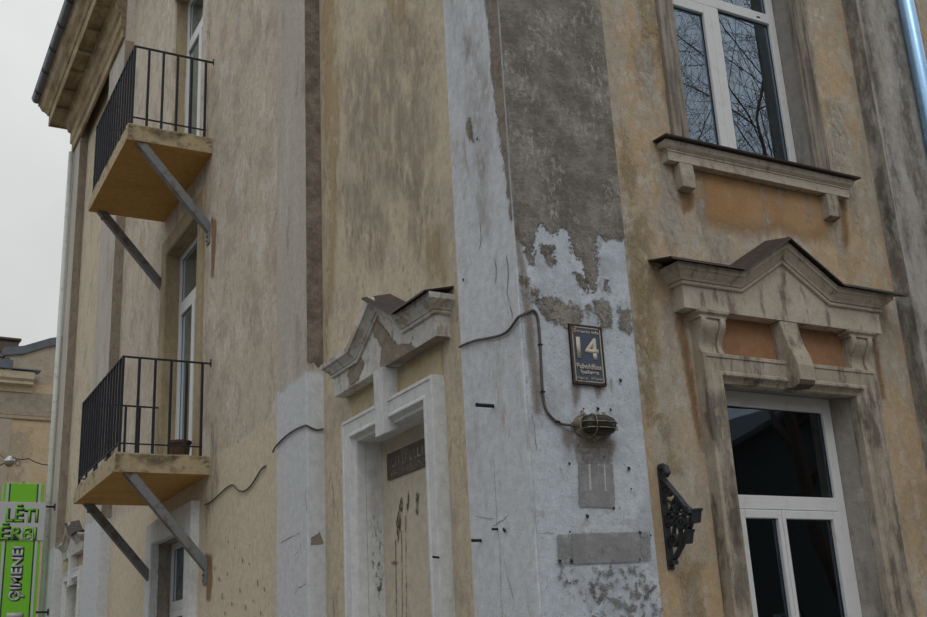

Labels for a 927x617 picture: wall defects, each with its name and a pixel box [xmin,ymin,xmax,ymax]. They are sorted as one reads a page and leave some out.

peeling [485,0,680,472]
peeling [558,562,663,617]